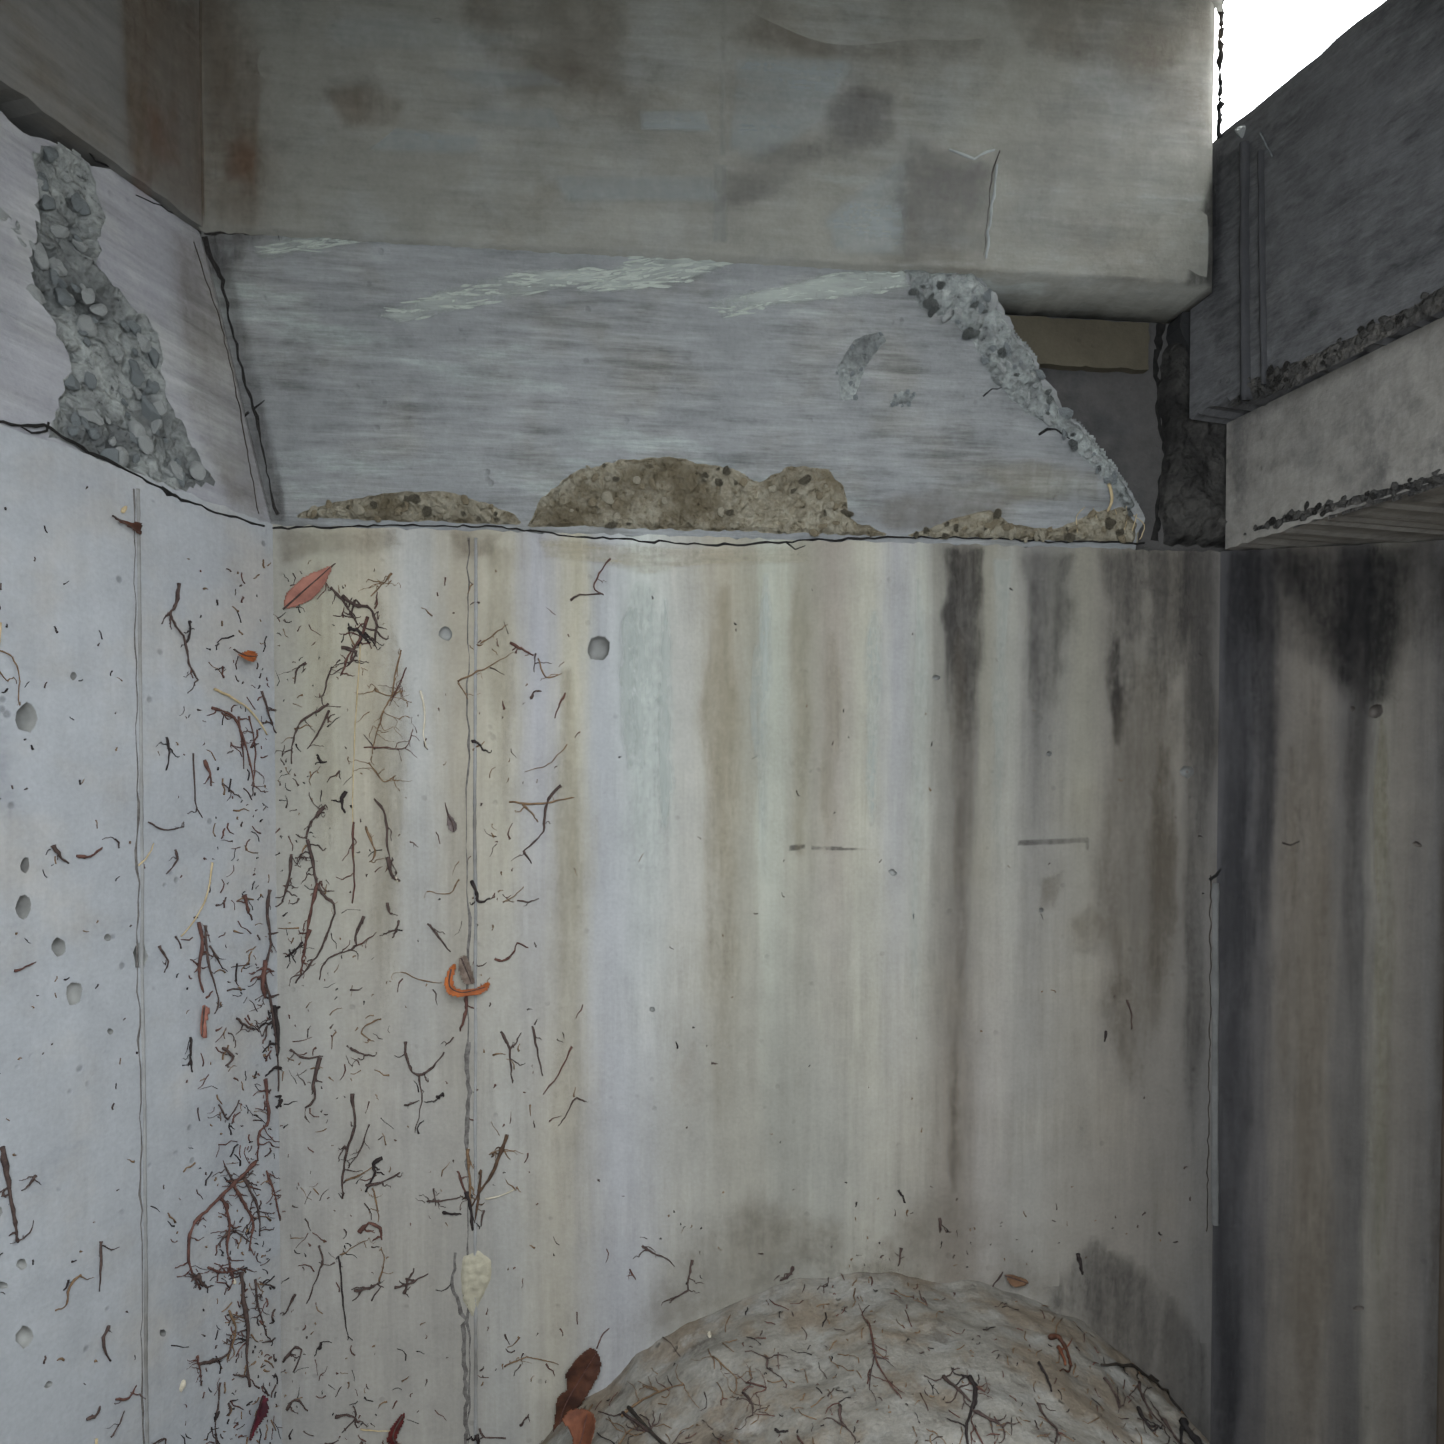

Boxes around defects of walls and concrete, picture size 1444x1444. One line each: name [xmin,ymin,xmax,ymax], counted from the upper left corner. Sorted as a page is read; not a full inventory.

crack [984,150,1000,252]
spalling [0,142,215,492]
peeling [836,331,886,401]
peeling [890,389,916,408]
spalling [903,270,1139,543]
spalling [1231,286,1444,407]
spalling [1243,469,1444,535]
leakage [944,550,982,650]